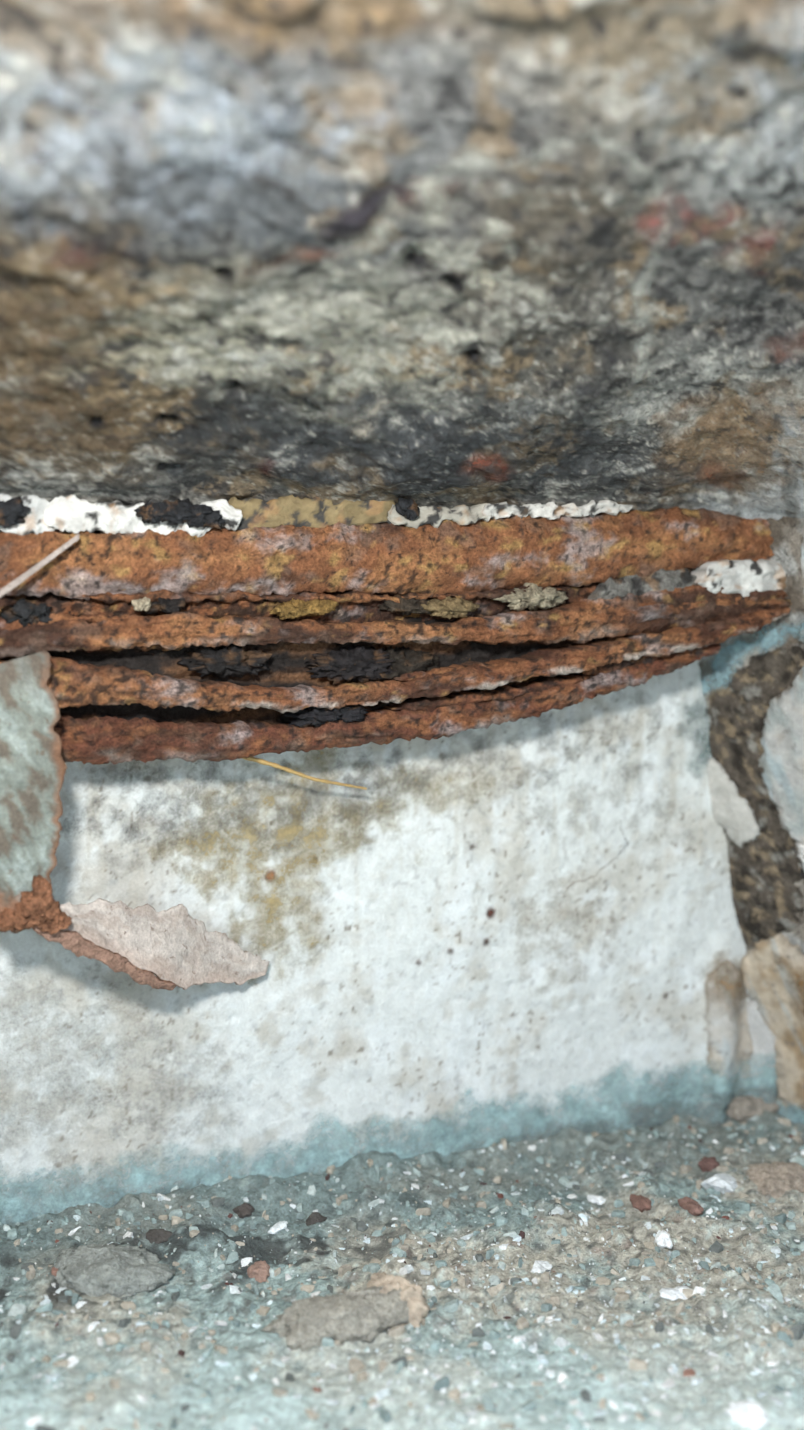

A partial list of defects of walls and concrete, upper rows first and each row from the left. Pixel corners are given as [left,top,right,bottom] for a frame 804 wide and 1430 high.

damp [0,293,125,449]
damp [115,184,630,495]
rust [0,506,792,765]
spalling [705,628,804,1110]
crack [785,835,804,879]